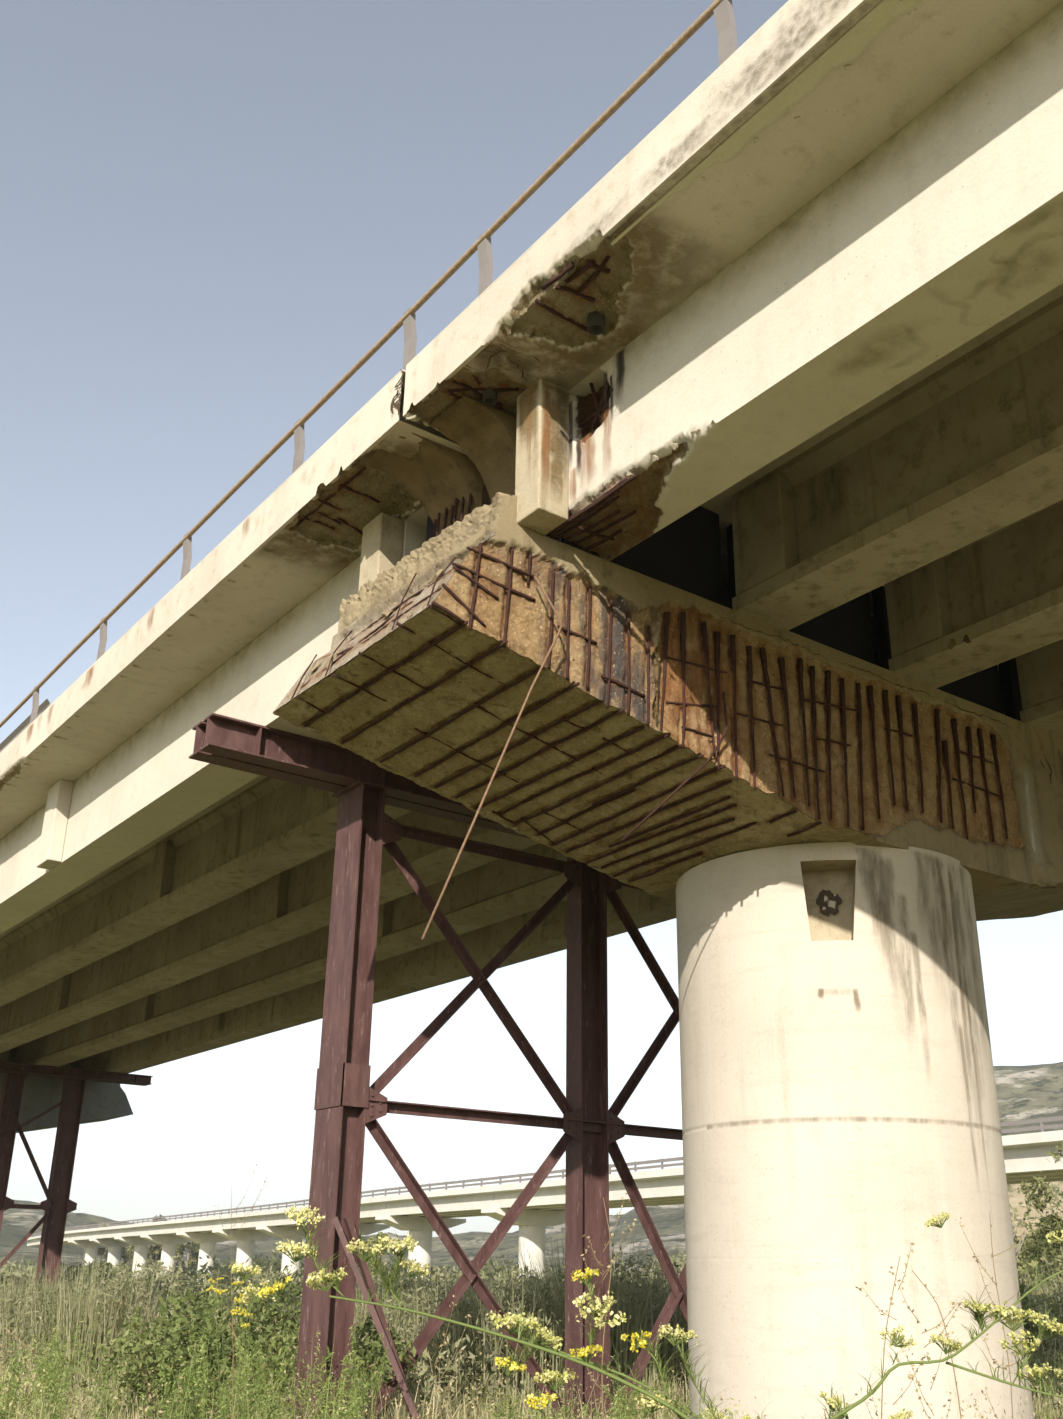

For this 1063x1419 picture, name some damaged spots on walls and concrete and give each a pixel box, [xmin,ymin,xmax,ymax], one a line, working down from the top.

spalling [489,0,922,348]
spalling [289,449,417,550]
spalling [433,493,473,537]
spalling [546,420,714,561]
spalling [273,530,1024,893]
leakage [861,852,924,1013]
leakage [917,854,976,1095]